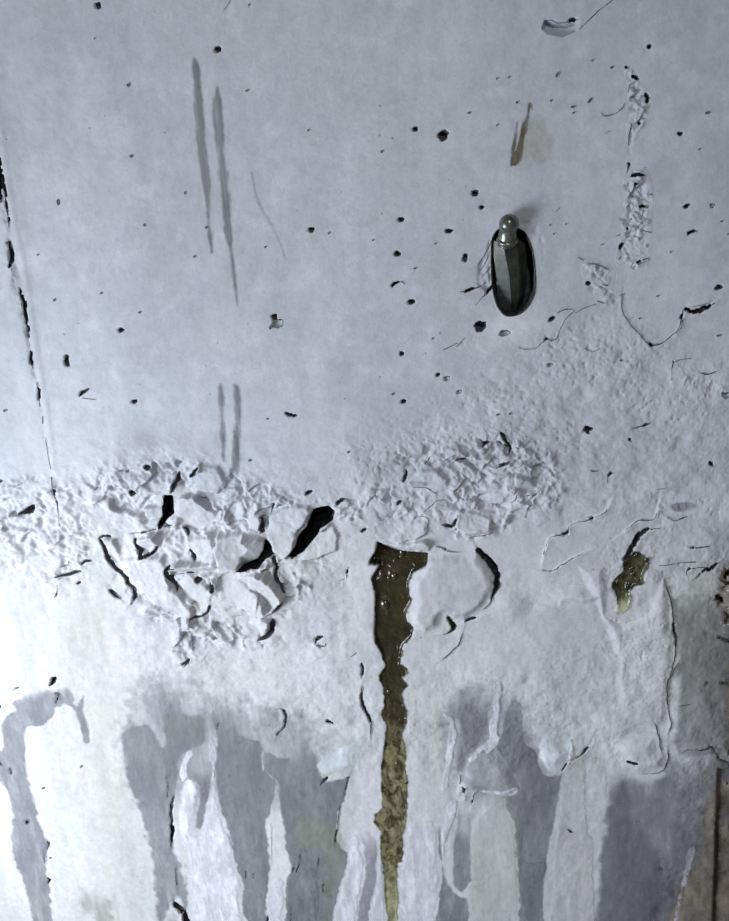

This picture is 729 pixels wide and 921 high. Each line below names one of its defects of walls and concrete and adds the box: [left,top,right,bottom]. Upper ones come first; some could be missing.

crack [519,304,596,350]
crack [622,296,714,372]
spalling [158,495,174,530]
spalling [237,539,274,573]
spalling [288,506,335,559]
crack [653,546,729,774]
damp [123,542,729,921]
damp [0,692,89,921]